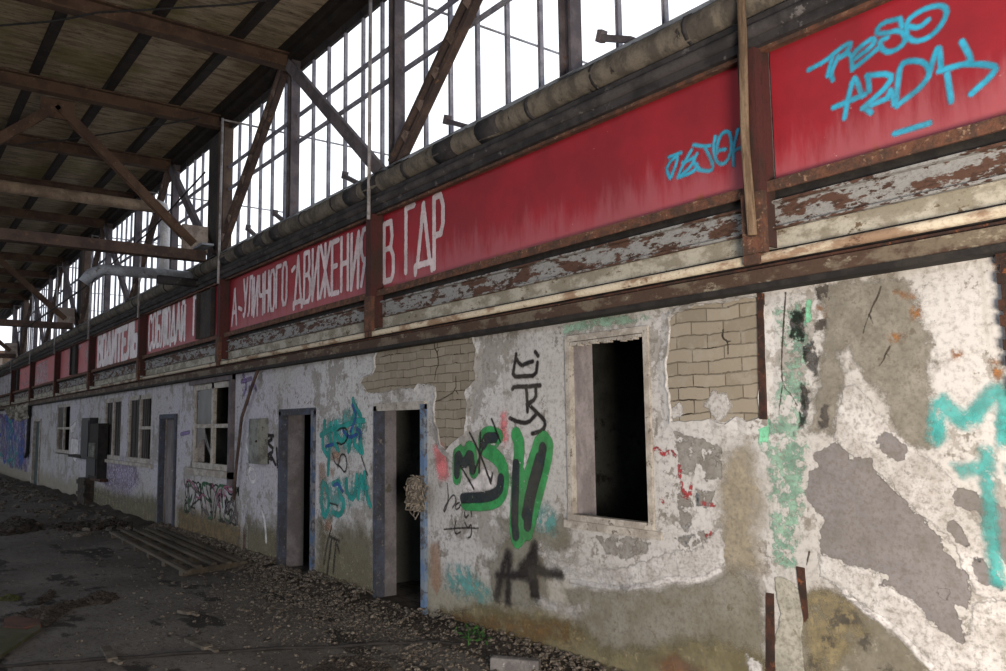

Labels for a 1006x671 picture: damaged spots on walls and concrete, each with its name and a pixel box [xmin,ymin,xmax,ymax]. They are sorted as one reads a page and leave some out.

spalling [357,337,483,460]
peeling [657,278,1006,671]
damp [440,447,766,671]
peeling [596,535,651,561]
corrosion [766,592,775,671]
corrosion [796,566,809,622]
damp [801,589,943,671]